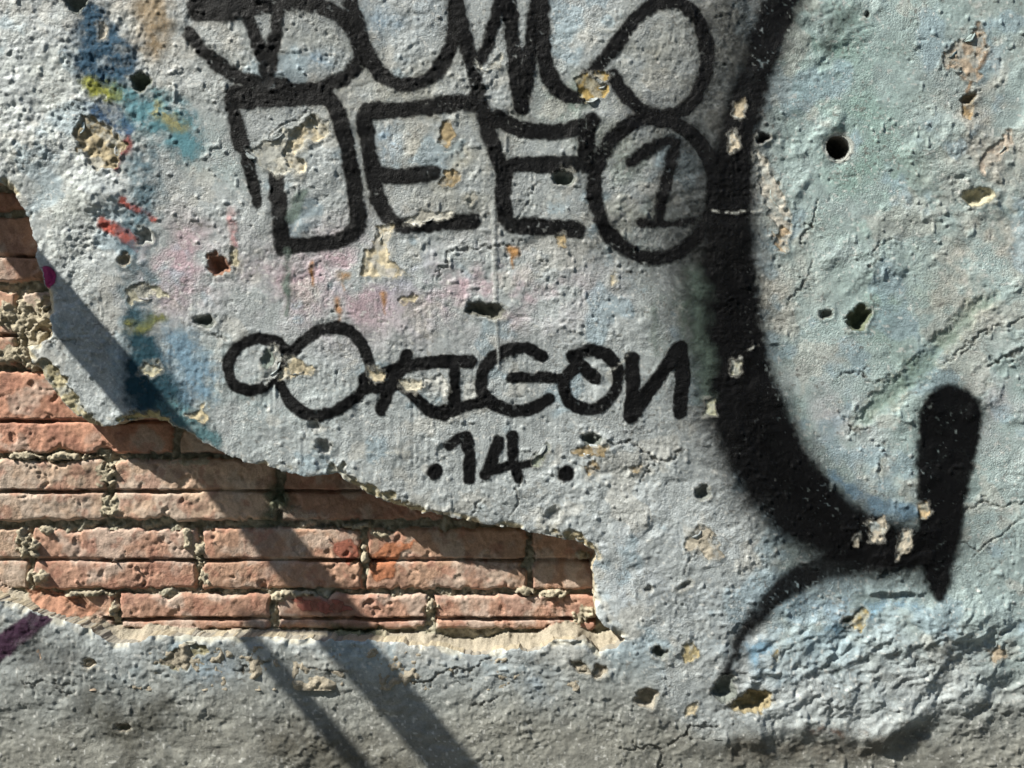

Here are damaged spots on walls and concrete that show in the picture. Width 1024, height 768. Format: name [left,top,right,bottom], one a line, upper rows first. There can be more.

peeling [942,21,989,120]
peeling [73,115,129,171]
spalling [206,246,240,276]
peeling [360,208,453,279]
spalling [194,315,214,328]
spalling [465,302,506,320]
peeling [37,358,101,425]
peeling [261,345,315,385]
peeling [368,367,385,381]
peeling [399,374,448,399]
peeling [309,420,443,514]
peeling [571,433,609,476]